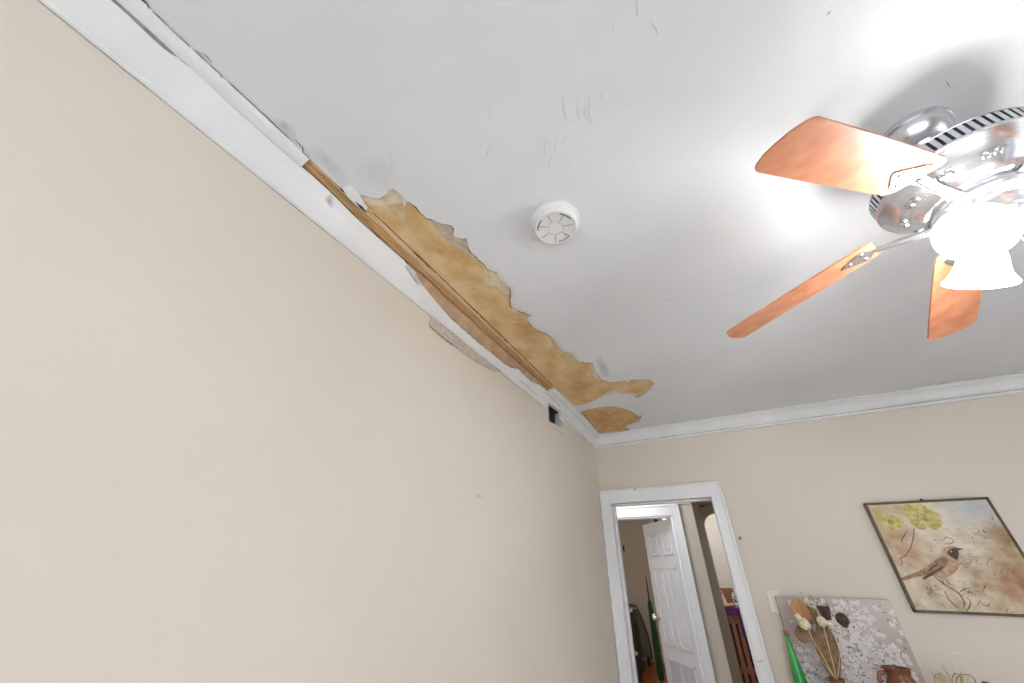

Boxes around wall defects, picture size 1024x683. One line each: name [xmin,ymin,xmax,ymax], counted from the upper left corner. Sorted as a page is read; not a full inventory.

flaking render [339,185,654,435]